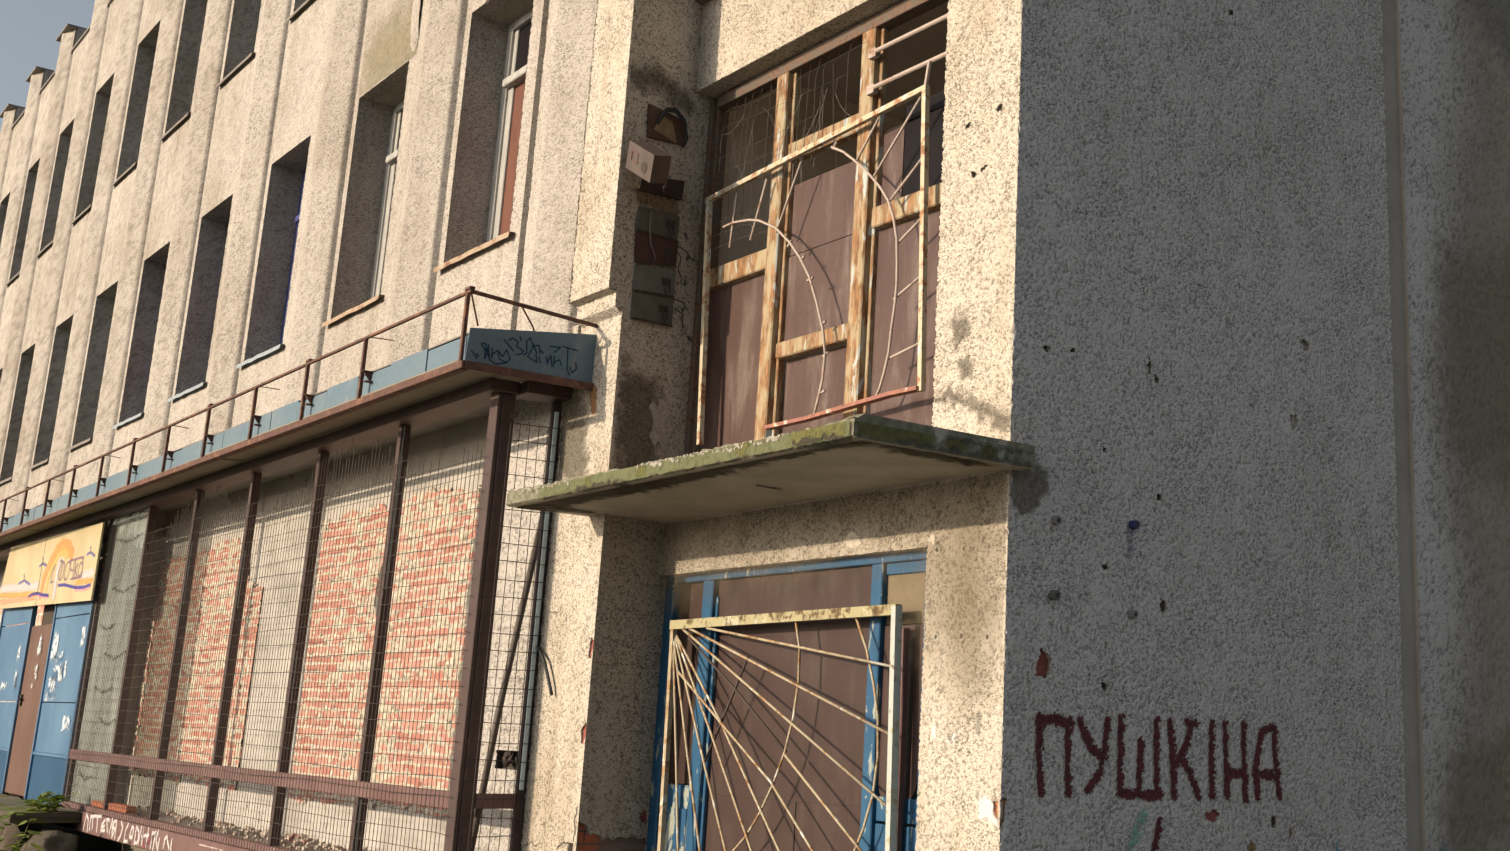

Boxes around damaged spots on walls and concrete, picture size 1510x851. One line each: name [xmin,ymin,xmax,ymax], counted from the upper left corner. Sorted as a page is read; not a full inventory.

damp [517,374,988,514]
damp [1010,465,1049,514]
damp [946,498,991,639]
flaking render [568,809,648,851]